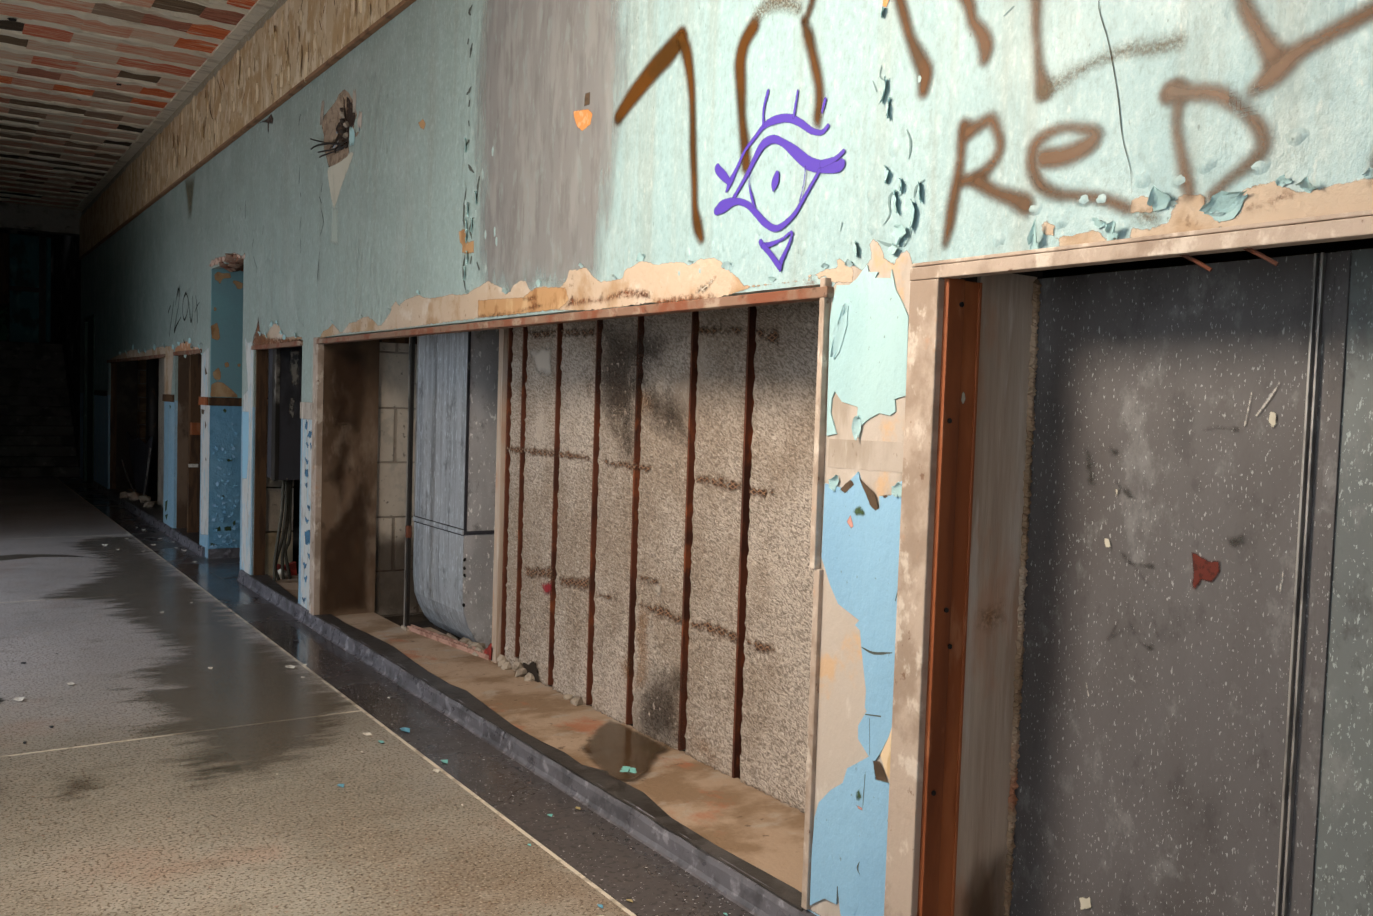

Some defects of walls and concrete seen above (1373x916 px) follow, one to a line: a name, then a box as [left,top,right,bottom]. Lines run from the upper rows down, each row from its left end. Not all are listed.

spalling [310,89,362,167]
spalling [209,253,245,289]
peeling [459,229,474,254]
peeling [1027,167,1373,250]
spalling [1042,238,1373,278]
peeling [111,307,302,575]
peeling [292,419,312,610]
peeling [320,239,913,916]